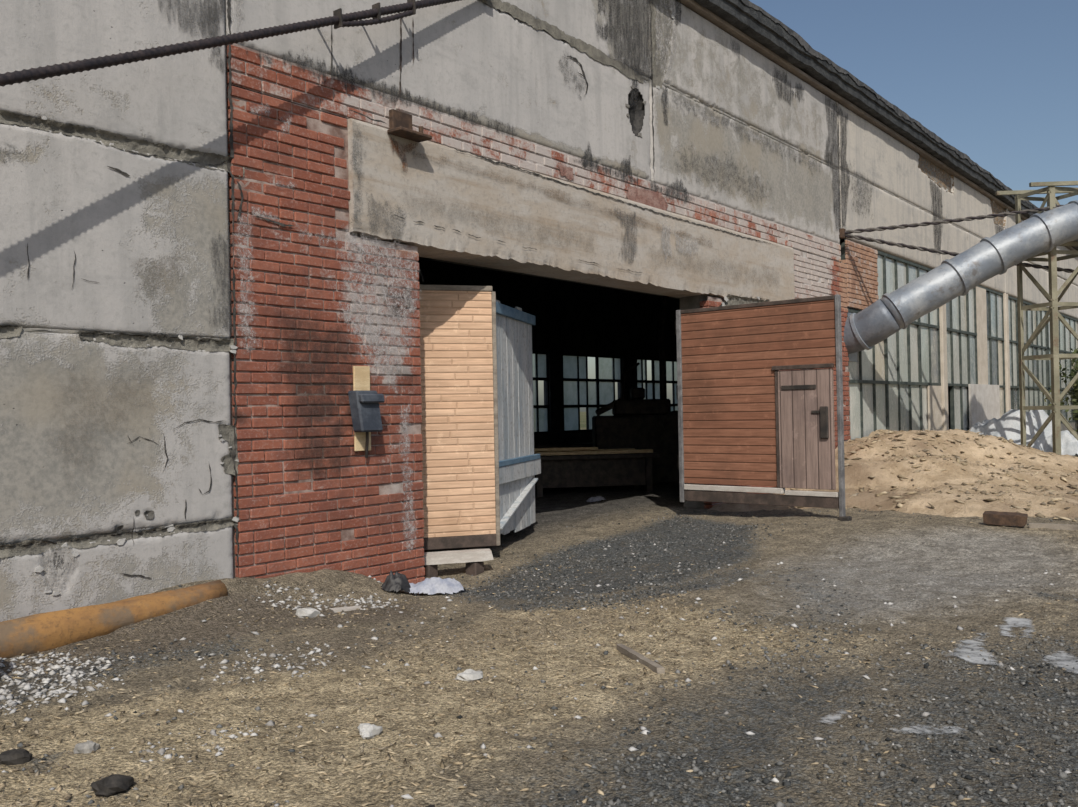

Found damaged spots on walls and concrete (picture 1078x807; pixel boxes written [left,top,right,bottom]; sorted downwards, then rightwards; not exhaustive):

damp [159,0,230,68]
damp [597,0,653,105]
crack [350,110,387,124]
crack [429,140,771,244]
damp [662,87,874,229]
spalling [918,153,954,193]
crack [0,0,294,573]
damp [301,131,417,392]
spalling [218,424,239,475]
damp [400,405,416,551]